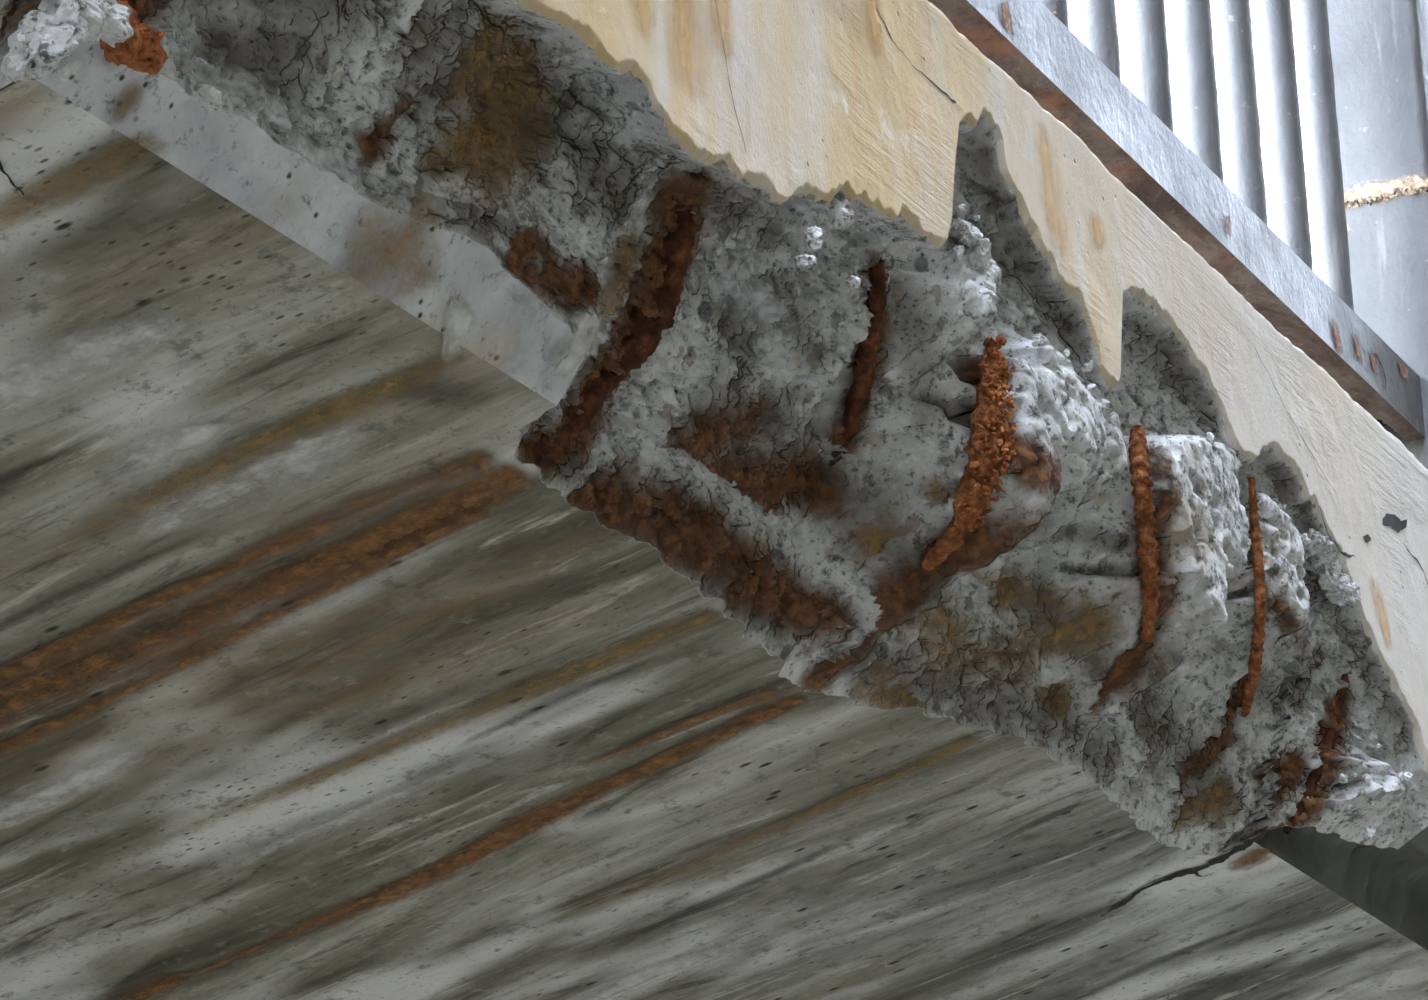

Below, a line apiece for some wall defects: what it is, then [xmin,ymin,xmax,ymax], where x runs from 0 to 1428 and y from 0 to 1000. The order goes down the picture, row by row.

rust [3,0,41,31]
spalling [0,0,165,89]
rust [115,86,141,121]
rust [132,0,162,23]
crack [715,0,746,150]
crack [875,4,956,104]
rust [0,137,163,224]
spalling [126,0,1428,856]
rust [0,172,1115,1000]
rust [1088,443,1177,713]
crack [1100,830,1271,917]